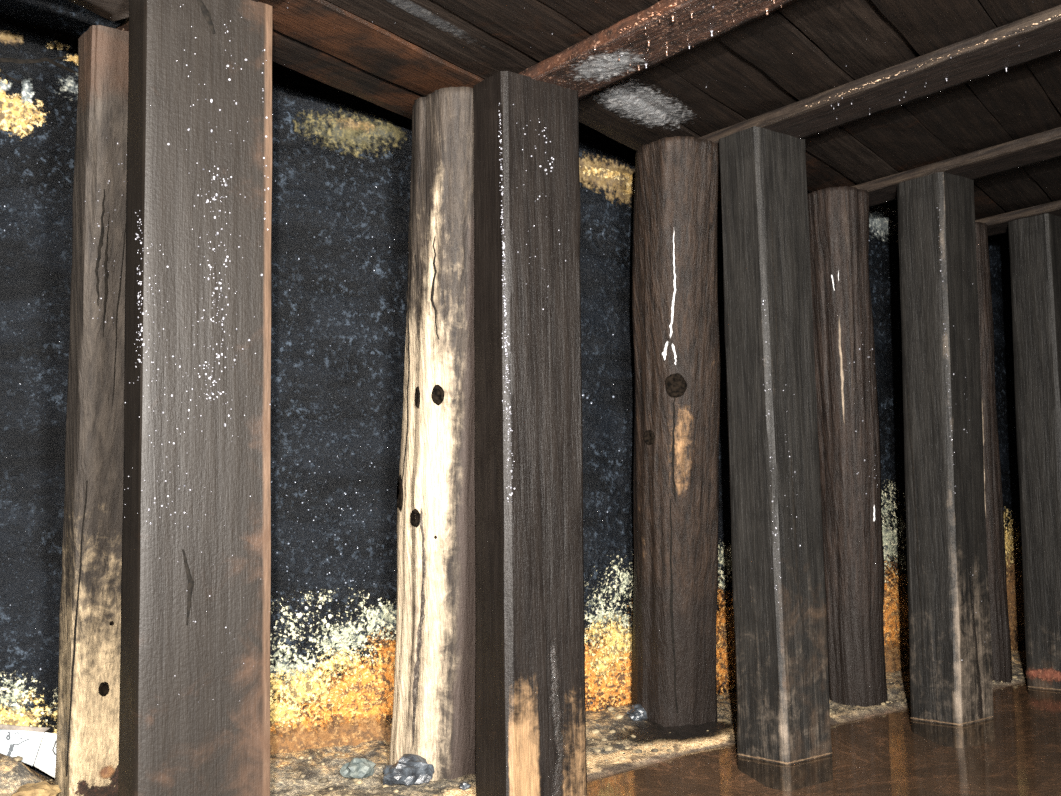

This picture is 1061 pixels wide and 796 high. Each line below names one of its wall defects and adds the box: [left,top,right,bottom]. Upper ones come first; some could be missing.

crack [95,189,126,405]
crack [401,236,440,484]
leakage [662,234,676,365]